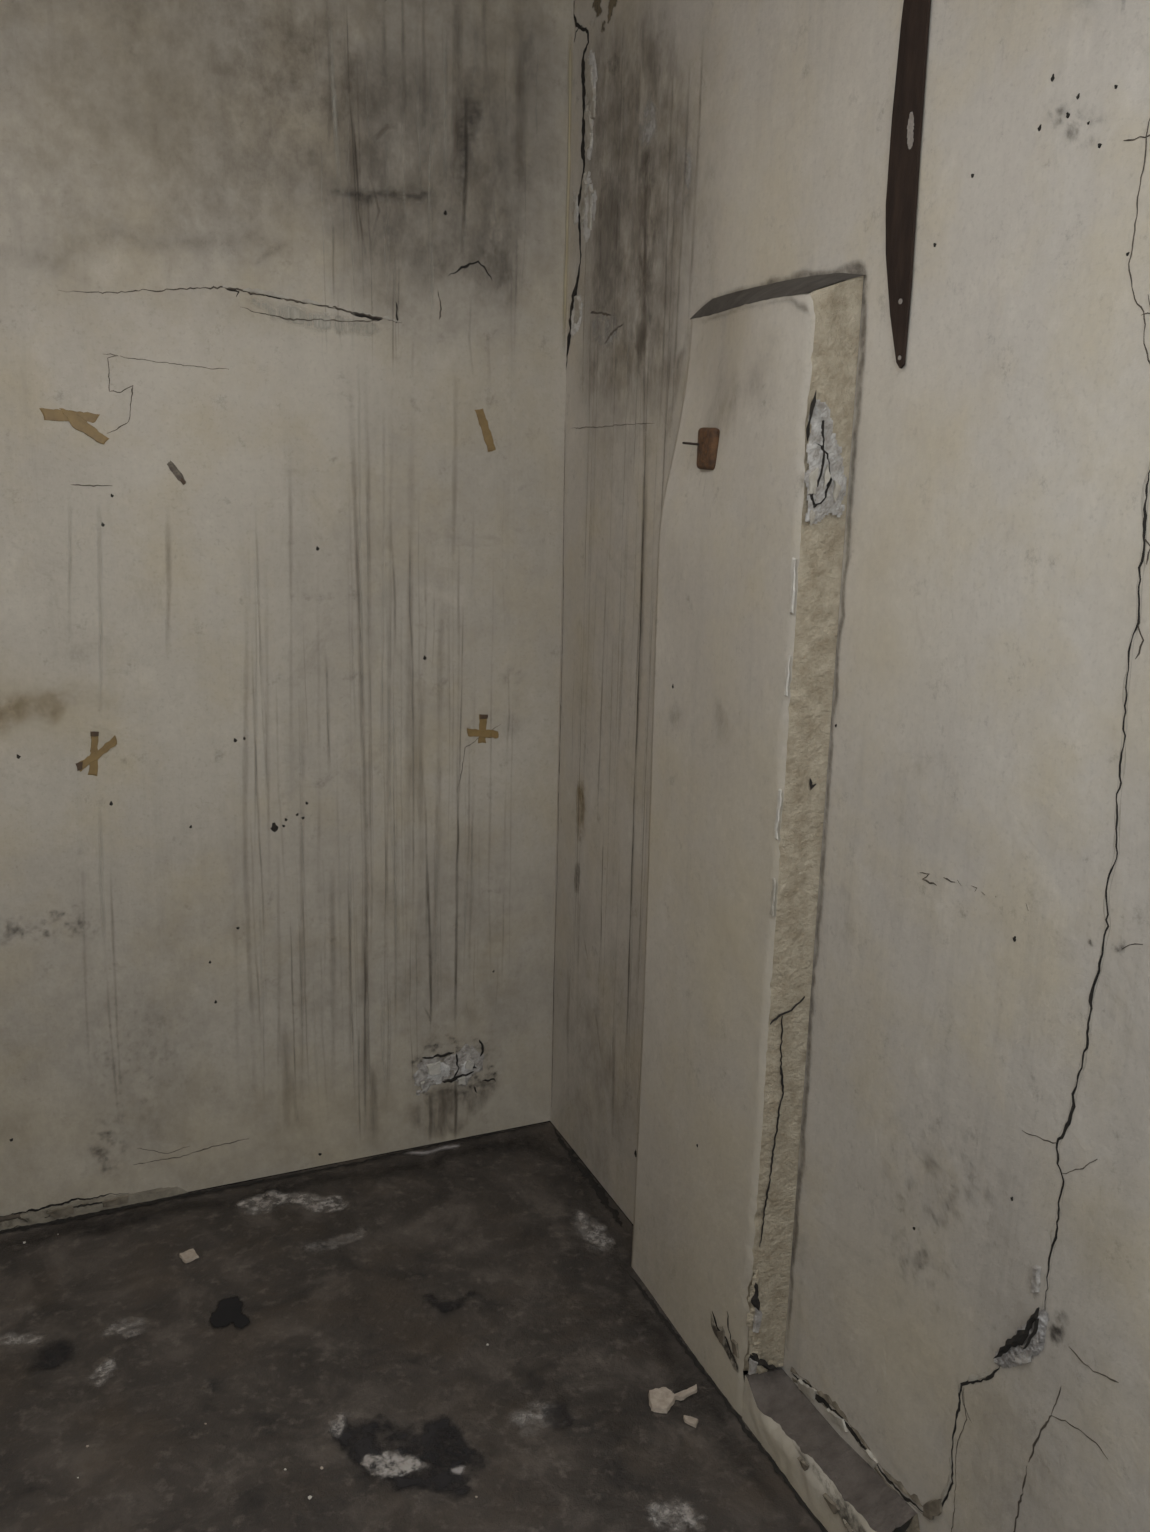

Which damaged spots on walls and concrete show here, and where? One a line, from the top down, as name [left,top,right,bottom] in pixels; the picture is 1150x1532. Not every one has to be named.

crack [59,285,402,334]
crack [438,260,492,319]
crack [566,15,598,367]
crack [1123,119,1150,364]
spalling [804,391,847,526]
crack [1022,462,1150,1311]
spalling [413,1040,496,1109]
spalling [711,1269,777,1375]
spalling [994,1265,1061,1369]
flaking render [823,1493,866,1532]